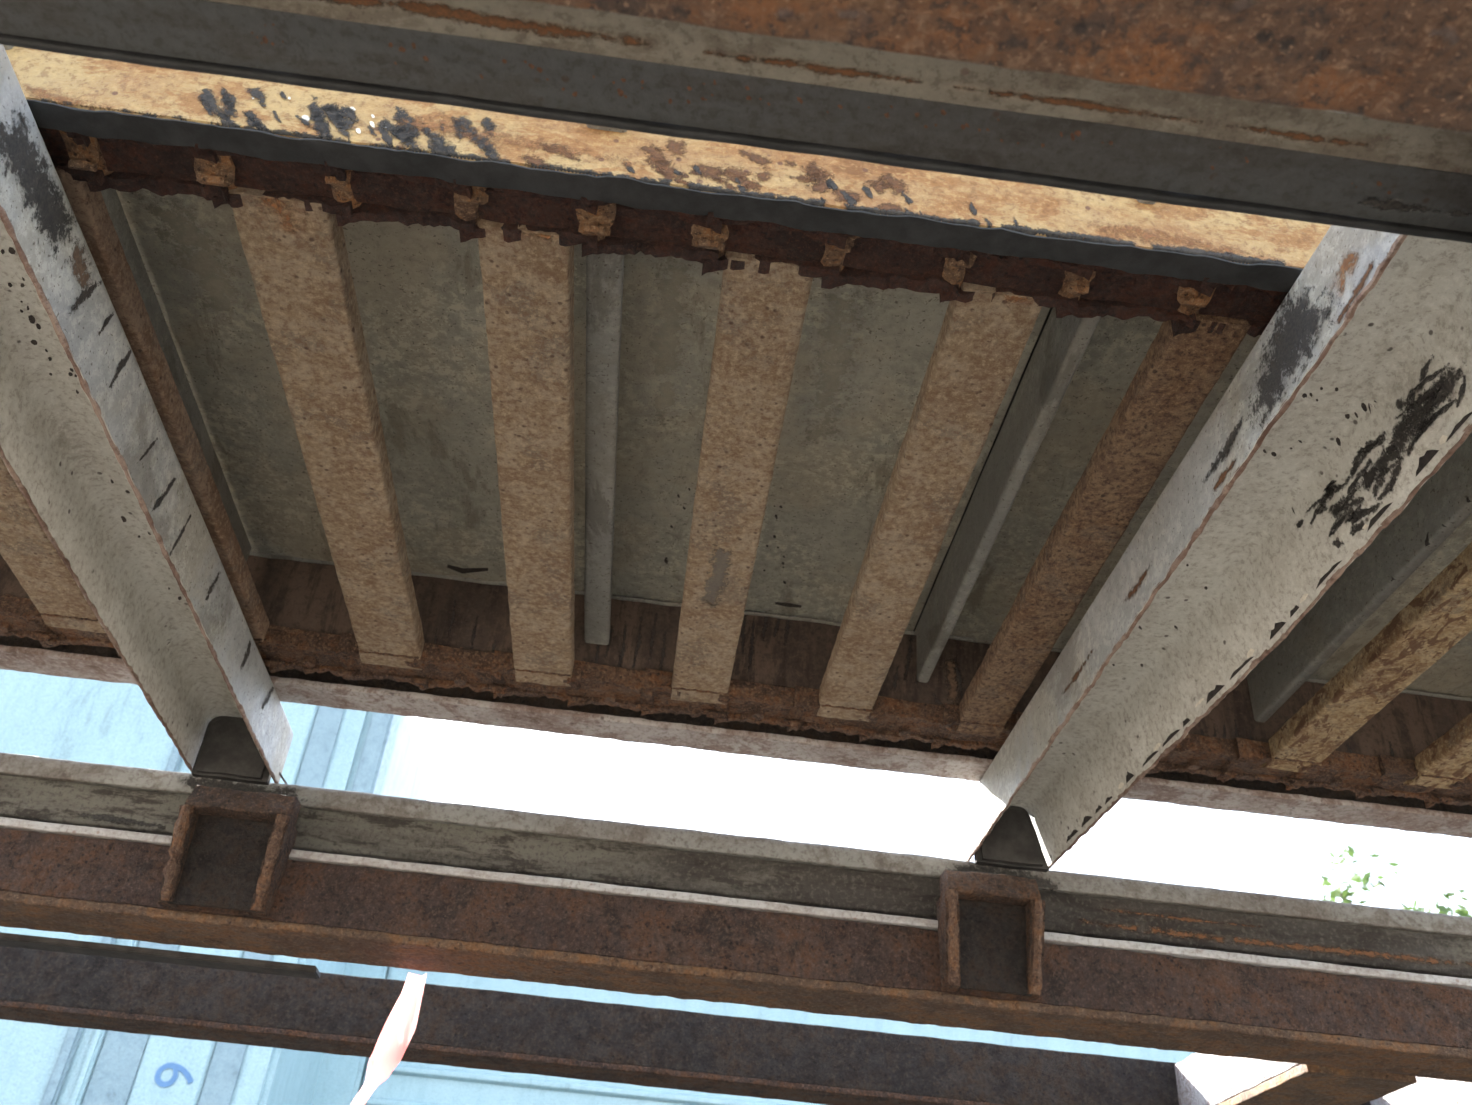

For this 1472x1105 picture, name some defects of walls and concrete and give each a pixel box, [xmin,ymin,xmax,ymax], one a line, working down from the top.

rust [320,0,648,46]
rust [703,51,922,83]
peeling [198,87,500,162]
rust [954,86,1202,123]
peeling [520,142,580,171]
peeling [624,140,922,215]
rust [1416,412,1472,476]
rust [1367,502,1393,532]
rust [1270,605,1299,640]
rust [1207,656,1254,703]
rust [1126,718,1190,783]
rust [1066,796,1112,843]